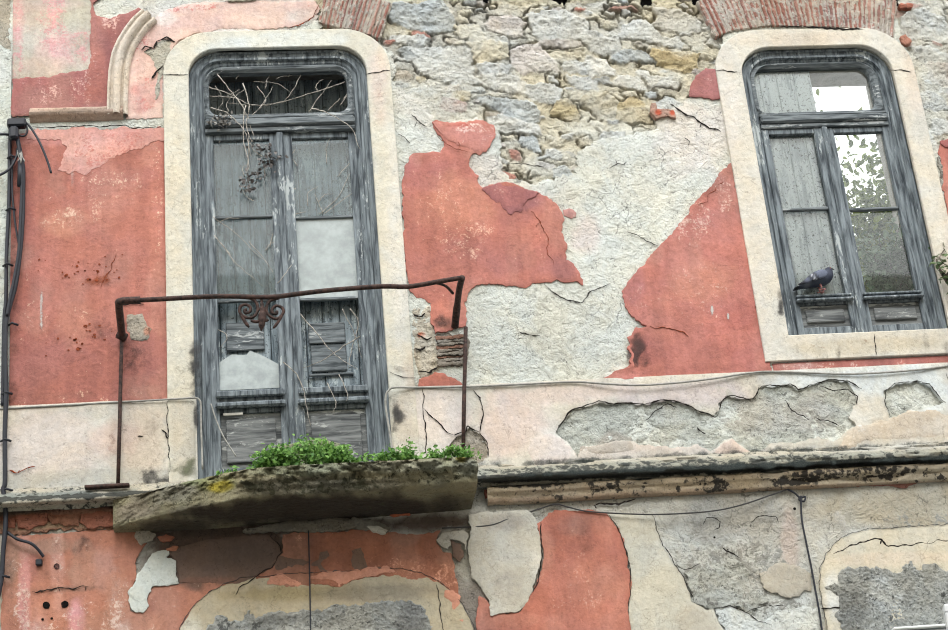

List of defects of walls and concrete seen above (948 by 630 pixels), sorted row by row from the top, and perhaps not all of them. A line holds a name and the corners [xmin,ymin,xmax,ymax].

flaking render [891,0,948,214]
peeling [0,0,329,406]
flaking render [378,0,722,386]
peeling [528,163,948,465]
flaking render [425,391,489,463]
damp [730,448,809,468]
damp [826,445,907,464]
peeling [0,511,226,630]
peeling [243,509,820,630]
crack [833,538,948,554]